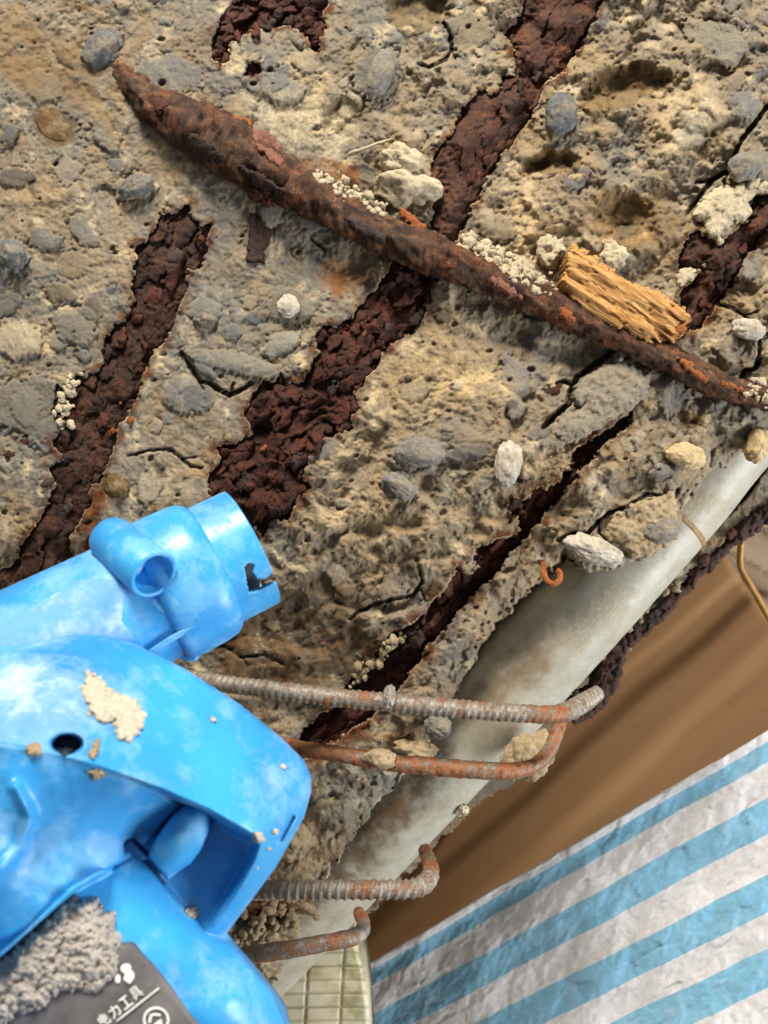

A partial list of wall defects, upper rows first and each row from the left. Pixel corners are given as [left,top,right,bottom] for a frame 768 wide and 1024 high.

corrosion [110,0,768,537]
corrosion [0,197,213,590]
crack [182,354,251,397]
crack [128,448,201,468]
crack [350,561,426,618]
corrosion [344,412,633,694]
crack [559,490,678,541]
corrosion [295,706,376,746]
spalling [186,669,604,780]
spalling [240,843,440,965]